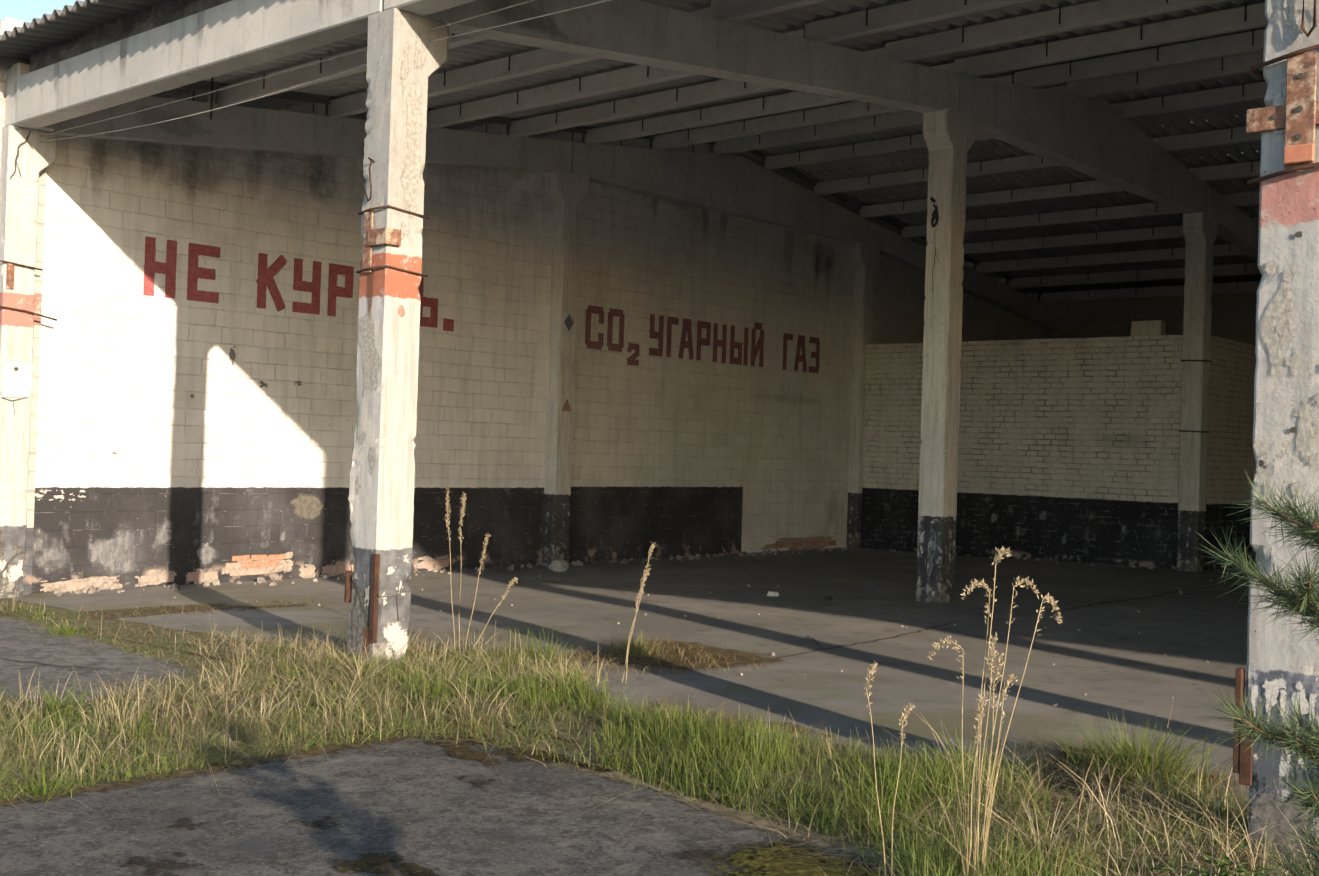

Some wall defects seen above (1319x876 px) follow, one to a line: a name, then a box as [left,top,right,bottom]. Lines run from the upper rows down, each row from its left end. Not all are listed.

peeling [359,309,380,397]
peeling [1260,261,1319,467]
peeling [355,418,376,495]
peeling [156,522,173,545]
flaking render [0,530,454,663]
rust [364,554,380,659]
crack [743,622,955,663]
rust [1233,667,1254,786]
peeling [1251,678,1319,734]